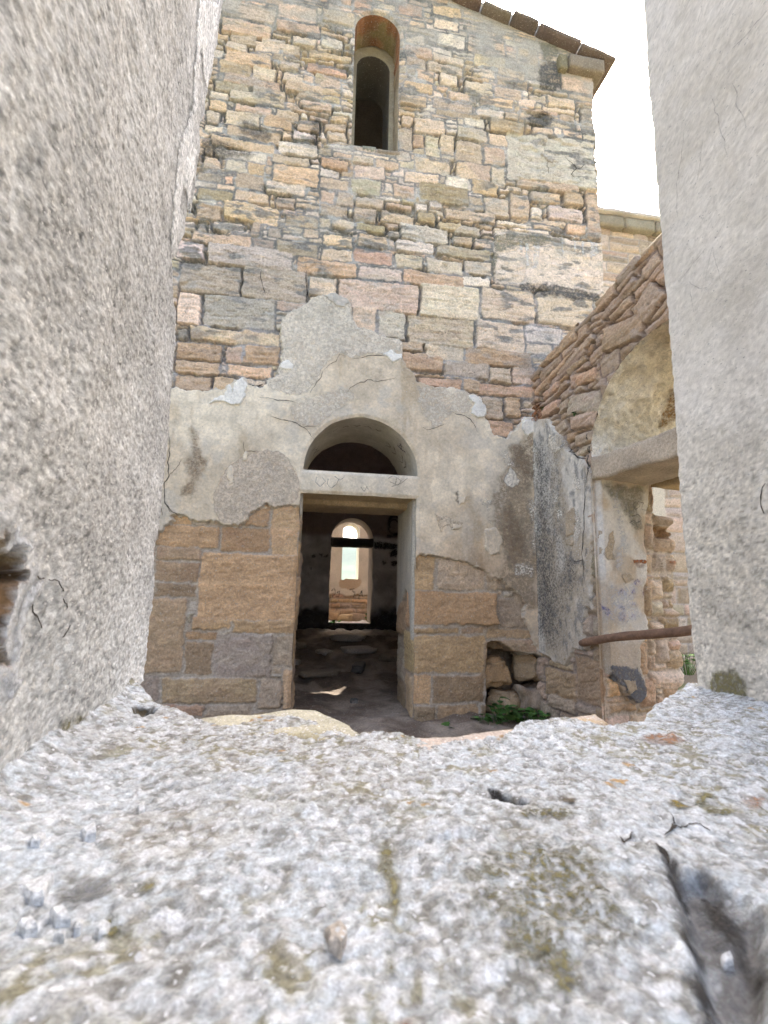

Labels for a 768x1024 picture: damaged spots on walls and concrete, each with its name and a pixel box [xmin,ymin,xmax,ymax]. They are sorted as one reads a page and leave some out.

flaking render [269,293,402,395]
flaking render [209,377,248,405]
crack [250,354,394,437]
flaking render [468,395,487,418]
damp [183,439,206,494]
flaking render [501,452,520,487]
flaking render [484,527,503,556]
damp [493,436,575,642]
crack [32,576,71,637]
spalling [132,450,300,719]
spalling [413,553,543,722]